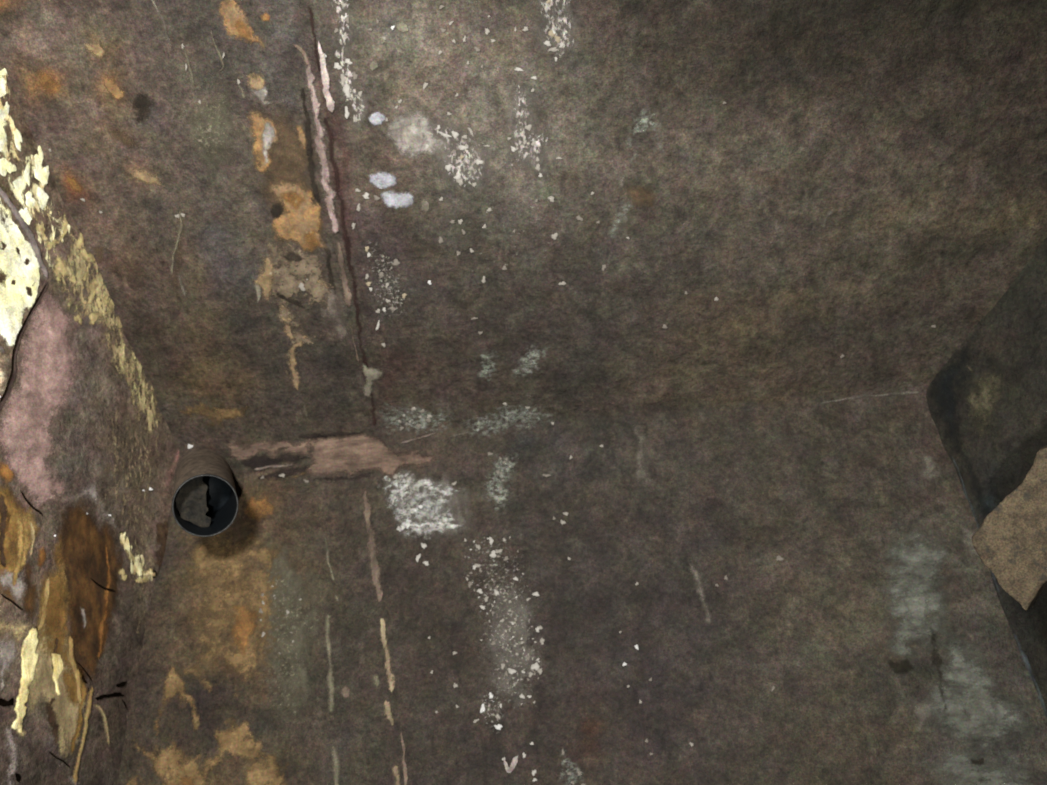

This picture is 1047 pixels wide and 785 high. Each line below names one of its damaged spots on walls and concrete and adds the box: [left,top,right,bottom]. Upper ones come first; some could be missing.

spalling [0,68,164,633]
rust [220,0,265,47]
rust [247,73,336,301]
rust [280,305,307,390]
water stain [332,0,365,122]
rust [324,118,376,426]
water stain [431,112,491,188]
water stain [514,0,576,65]
rust [0,465,123,678]
rust [137,719,284,785]
water stain [228,434,545,730]
water stain [886,532,1033,785]